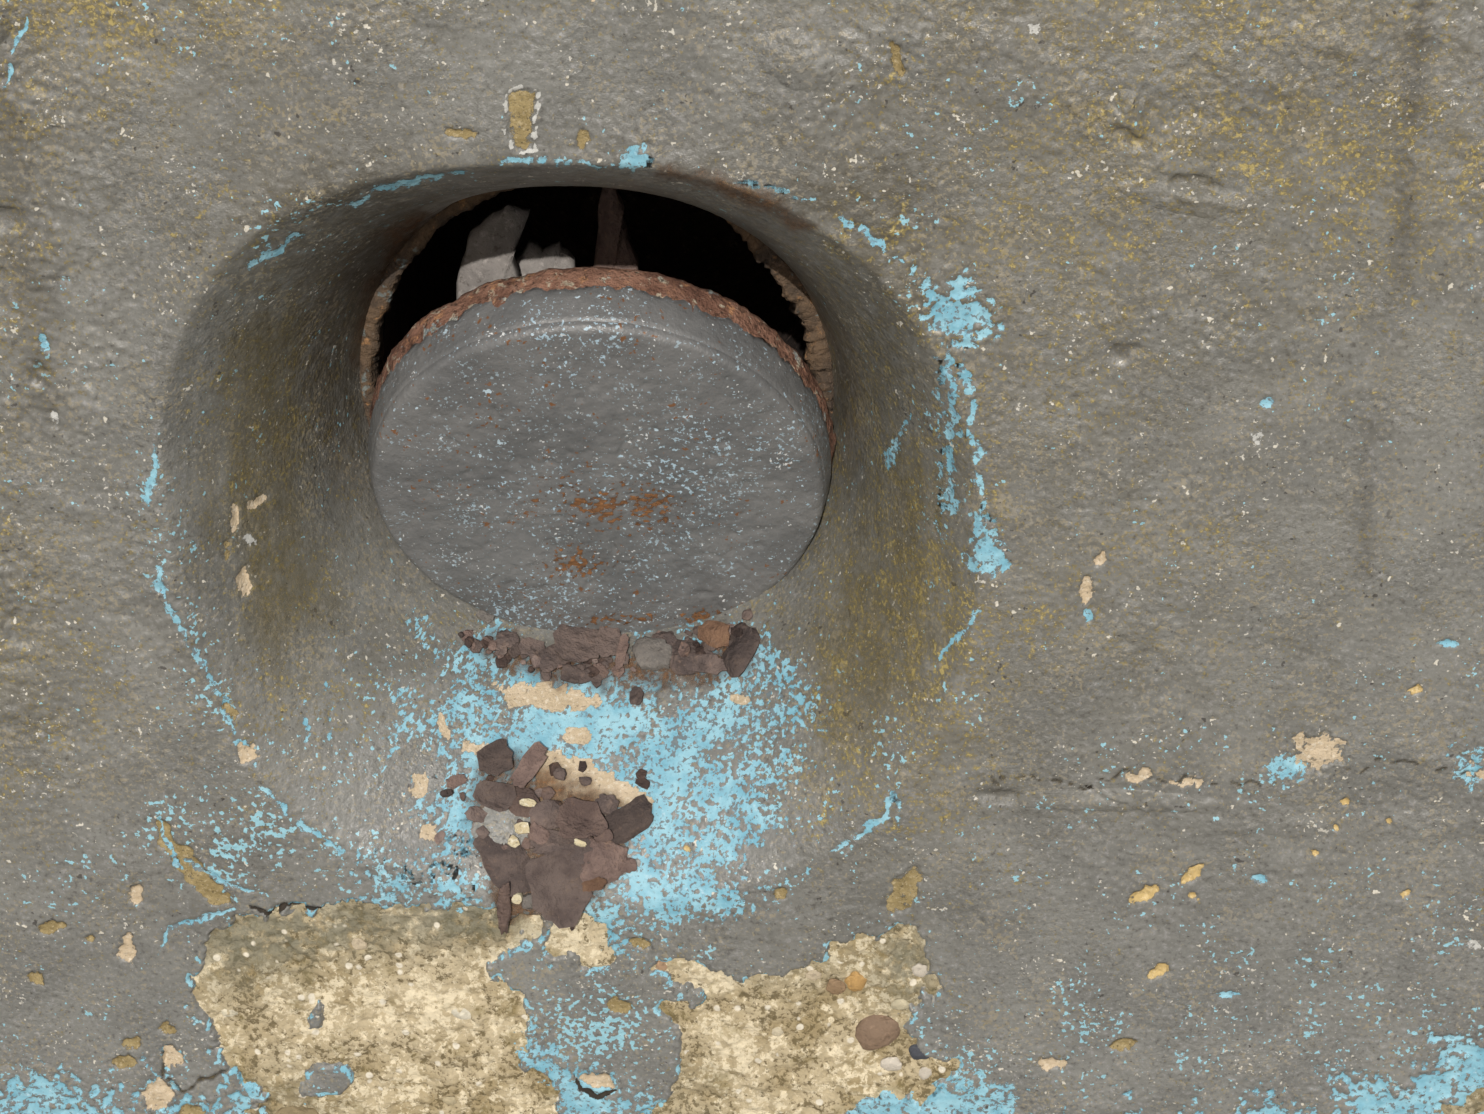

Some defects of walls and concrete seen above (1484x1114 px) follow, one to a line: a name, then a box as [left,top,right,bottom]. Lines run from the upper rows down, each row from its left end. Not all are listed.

spalling [502,84,541,155]
corrosion [369,266,837,471]
corrosion [531,476,695,586]
corrosion [484,606,732,684]
spalling [1262,732,1346,790]
spalling [1446,726,1484,792]
corrosion [485,755,607,859]
corrosion [491,882,538,935]
spalling [0,602,1032,1114]
corrosion [618,844,637,873]
peeling [1128,884,1159,903]
peeling [1236,1024,1484,1114]